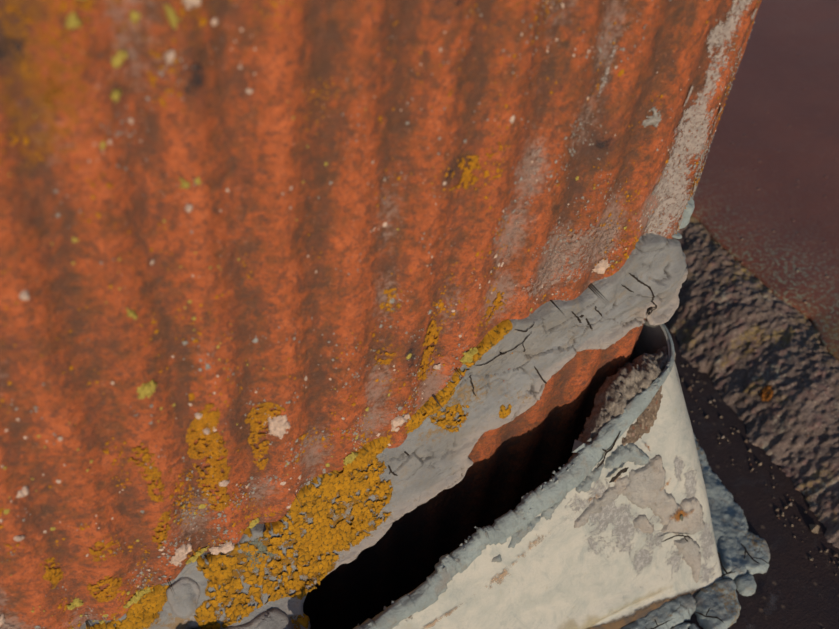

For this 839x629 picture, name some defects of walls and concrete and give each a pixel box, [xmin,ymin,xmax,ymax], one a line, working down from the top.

crack [621,273,657,316]
crack [572,306,603,329]
crack [469,324,547,396]
crack [717,543,771,578]
crack [696,608,724,623]